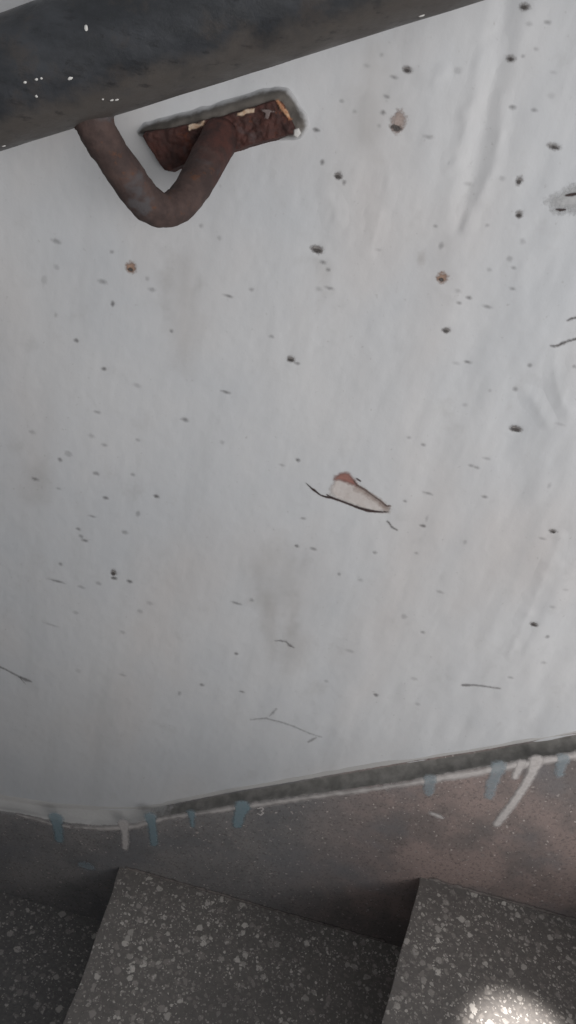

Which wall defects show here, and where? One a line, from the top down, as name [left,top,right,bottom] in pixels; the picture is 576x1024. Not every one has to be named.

spalling [391,111,405,133]
spalling [551,187,576,213]
peeling [307,473,390,513]